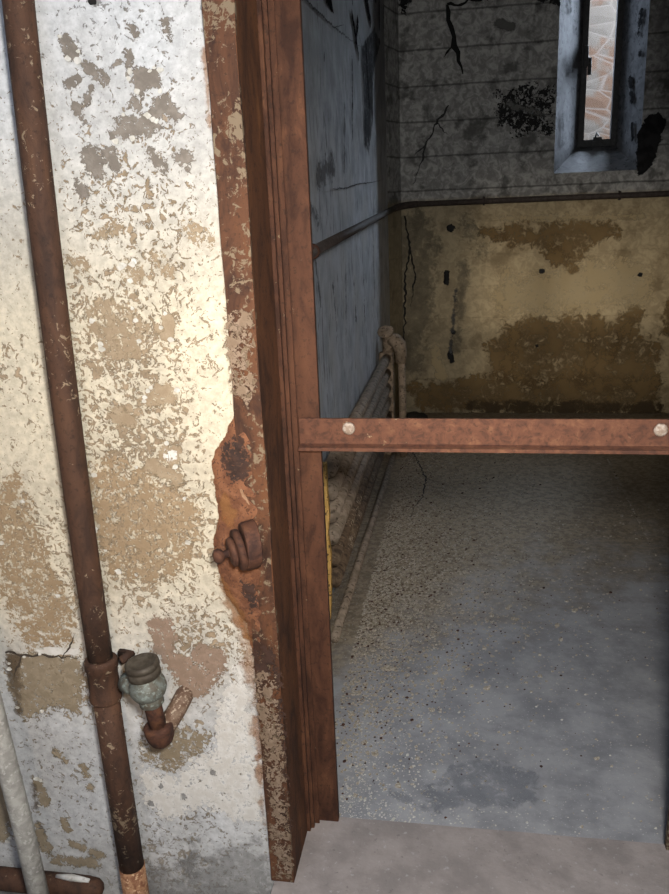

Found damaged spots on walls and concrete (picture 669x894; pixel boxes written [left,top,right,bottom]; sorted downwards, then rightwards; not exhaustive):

peeling [122,19,140,38]
peeling [159,17,172,43]
crack [444,0,482,74]
peeling [57,32,111,128]
peeling [71,48,196,205]
peeling [91,218,124,241]
peeling [180,217,215,251]
peeling [63,249,91,279]
peeling [117,249,177,287]
crack [403,216,416,340]
peeling [0,469,84,722]